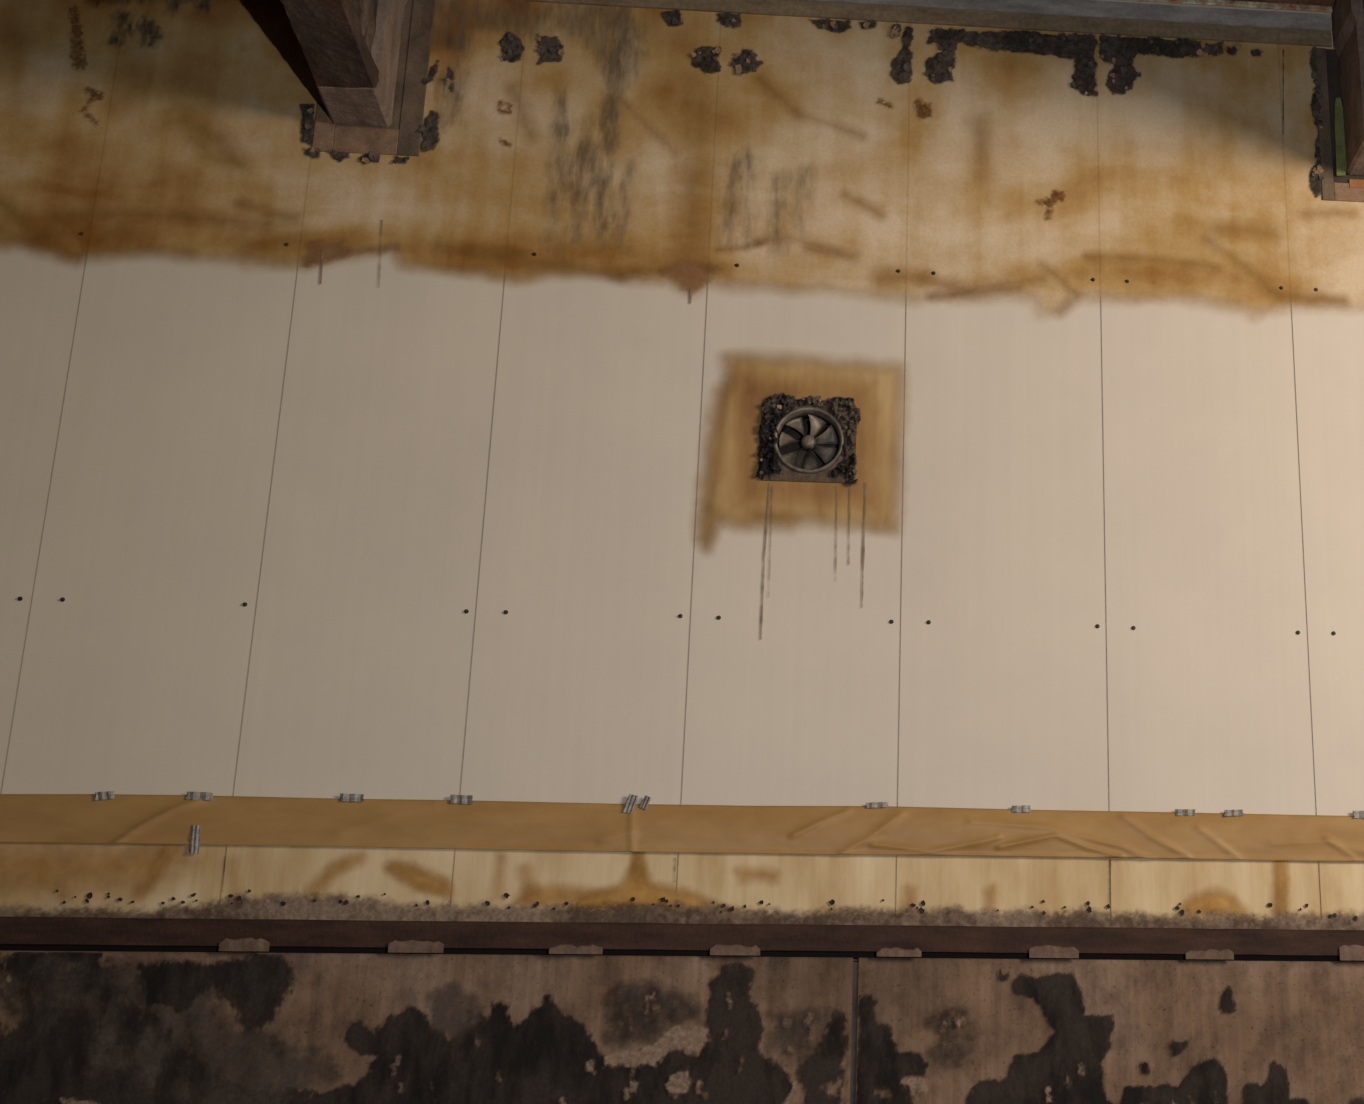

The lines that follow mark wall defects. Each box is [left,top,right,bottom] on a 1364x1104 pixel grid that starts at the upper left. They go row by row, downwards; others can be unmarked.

damp [760,483,773,639]
damp [835,482,866,606]
damp [0,843,183,896]
damp [391,864,448,892]
damp [517,852,724,910]
damp [1182,893,1245,914]
damp [1275,861,1286,912]